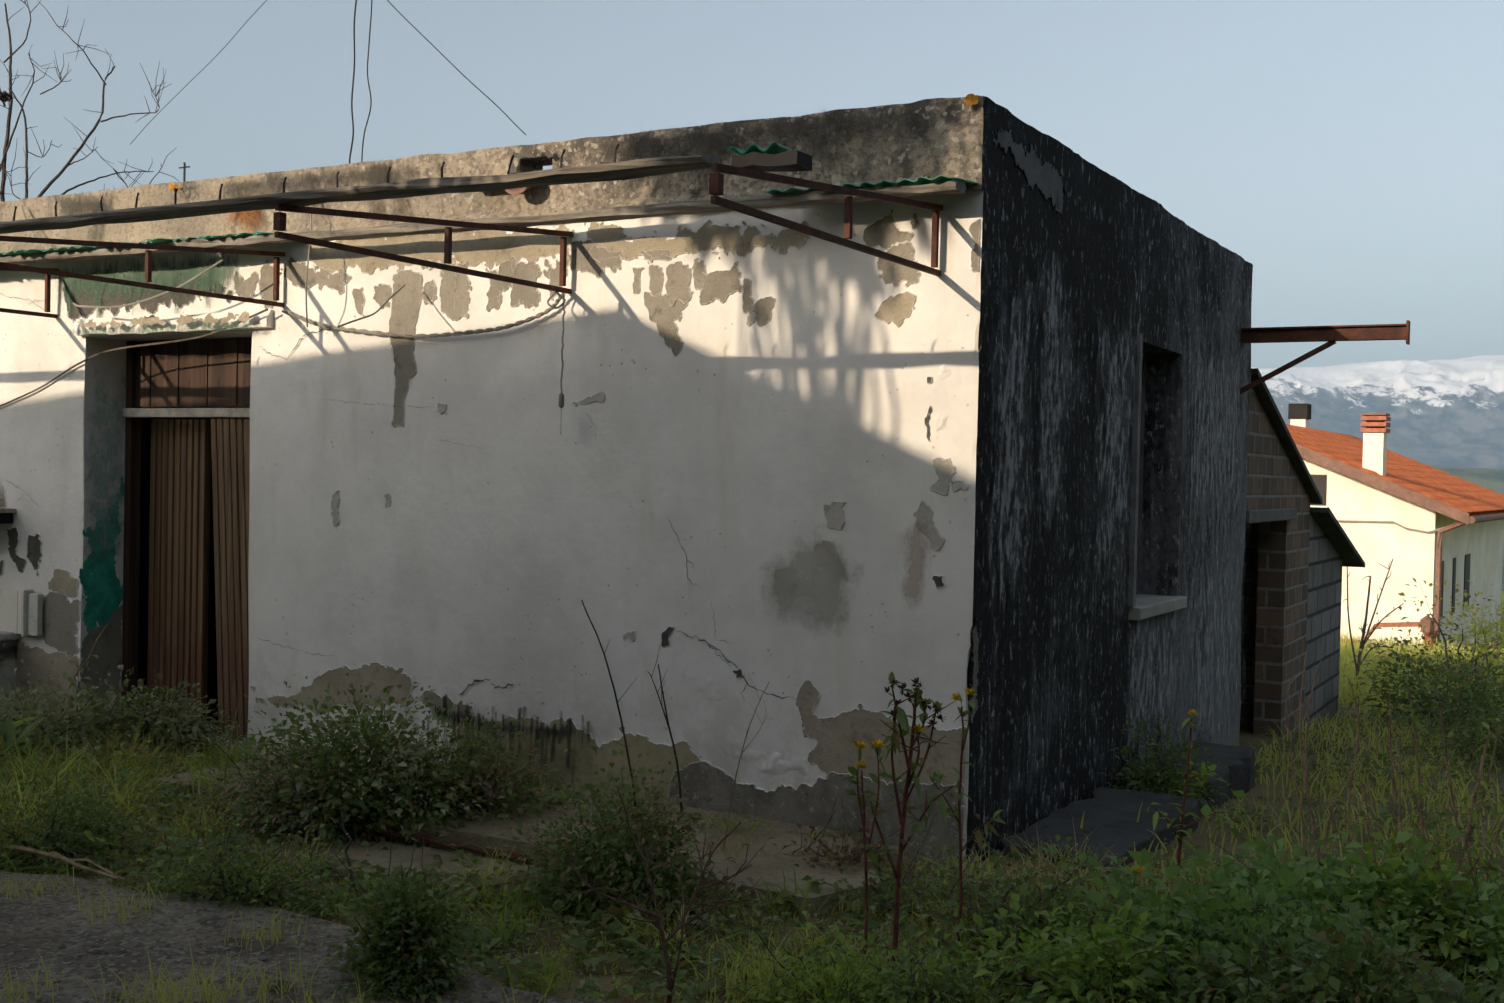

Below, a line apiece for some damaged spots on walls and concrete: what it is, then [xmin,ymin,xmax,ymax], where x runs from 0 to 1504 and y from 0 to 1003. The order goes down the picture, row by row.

peeling [62,219,810,428]
peeling [863,208,922,328]
crack [667,516,799,702]
peeling [814,500,849,583]
spalling [932,575,946,589]
peeling [913,456,969,551]
spalling [255,615,980,869]